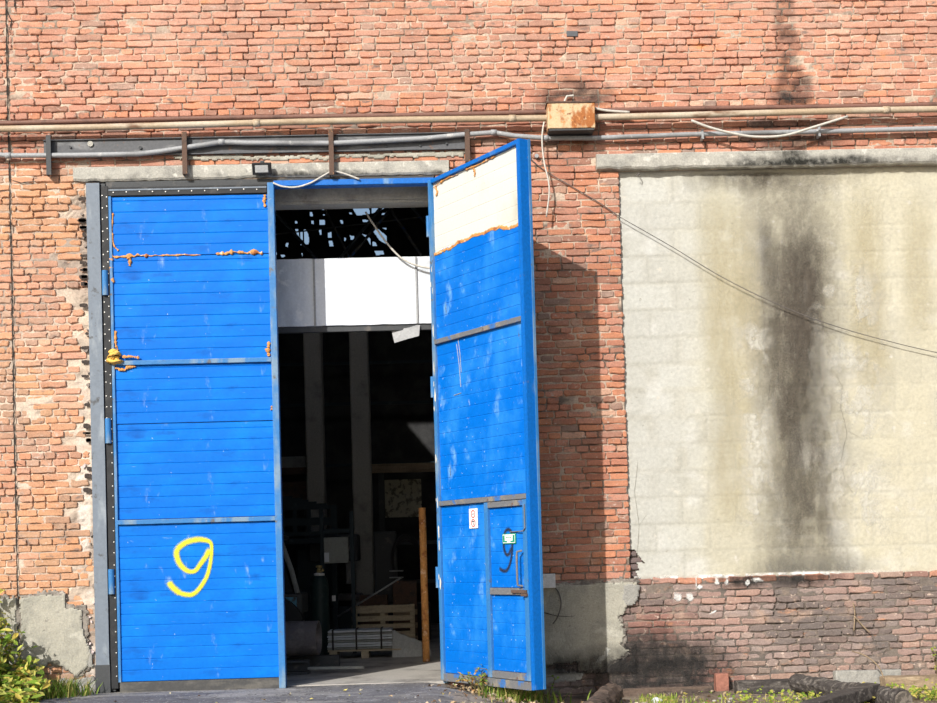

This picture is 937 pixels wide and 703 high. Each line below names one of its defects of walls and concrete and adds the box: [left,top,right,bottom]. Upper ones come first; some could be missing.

spalling [77,197,88,286]
spalling [81,329,90,388]
damp [765,229,827,543]
spalling [81,464,92,497]
flaking render [0,590,96,695]
flaking render [543,551,642,685]